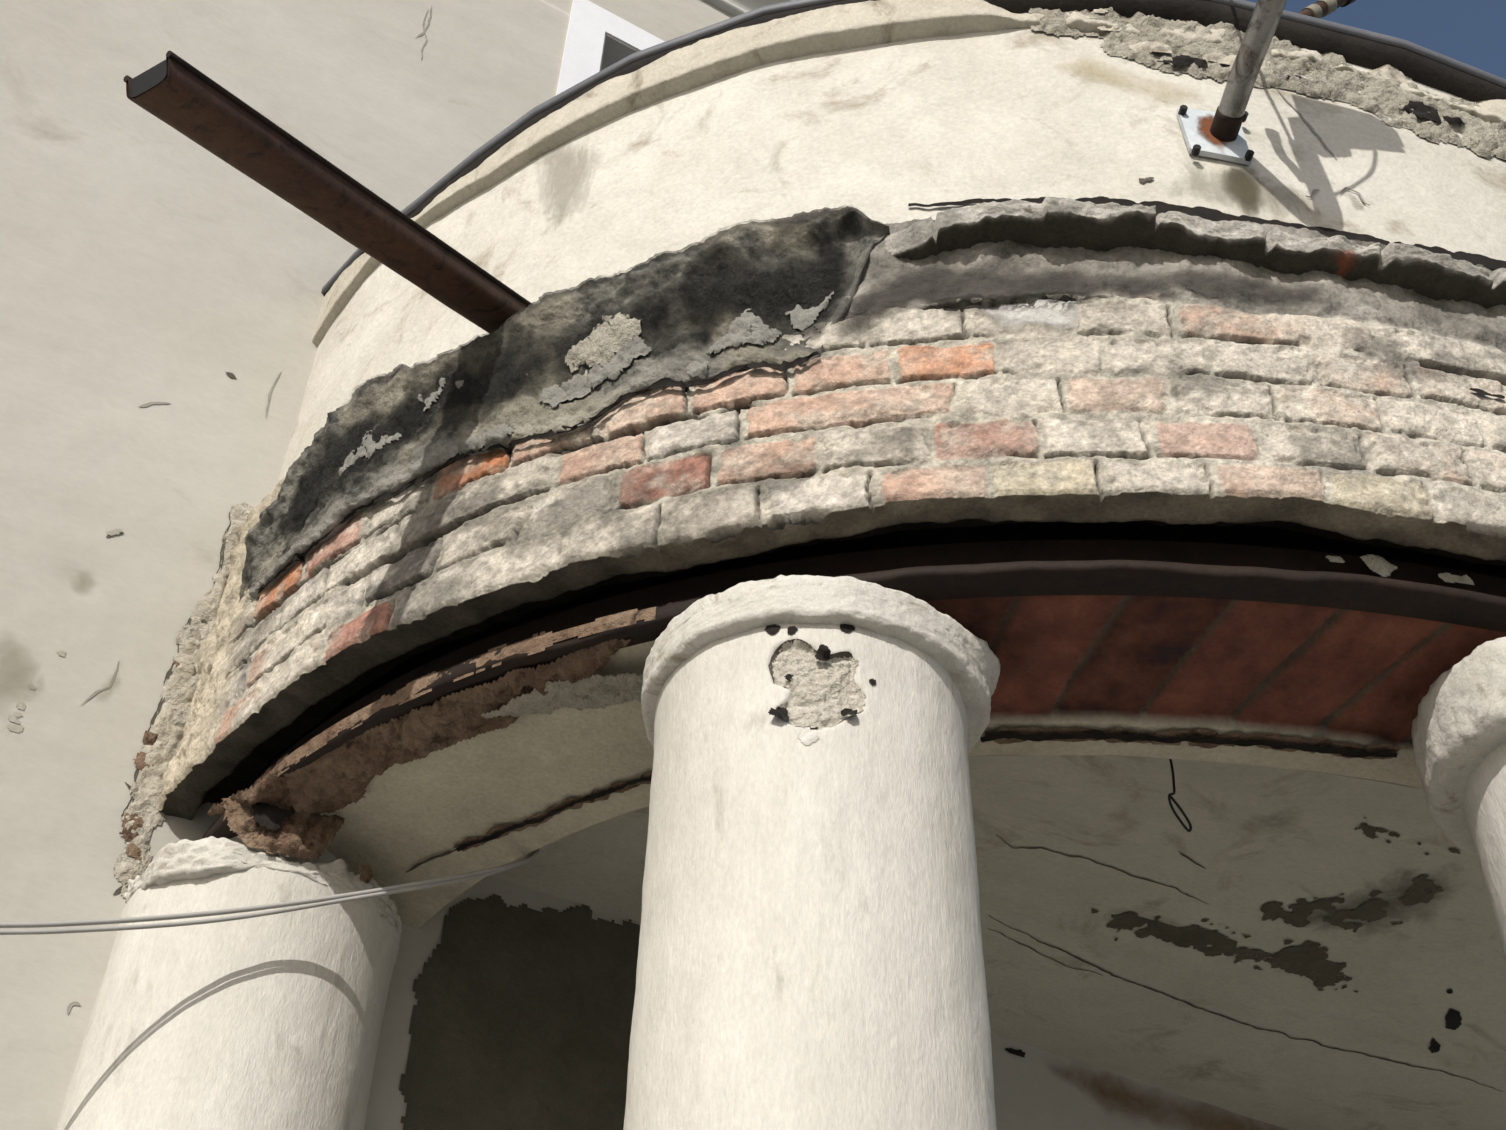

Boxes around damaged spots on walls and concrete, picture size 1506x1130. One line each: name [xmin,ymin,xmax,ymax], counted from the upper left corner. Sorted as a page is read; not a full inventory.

spalling [1028,7,1245,82]
rust [1199,115,1224,145]
spalling [1254,35,1506,160]
leakage [279,207,851,538]
spalling [113,502,252,897]
spalling [207,639,643,860]
spalling [764,624,876,730]
crack [406,772,652,873]
peeling [1354,817,1400,844]
flaking render [1091,875,1444,993]
flaking render [399,894,640,1130]